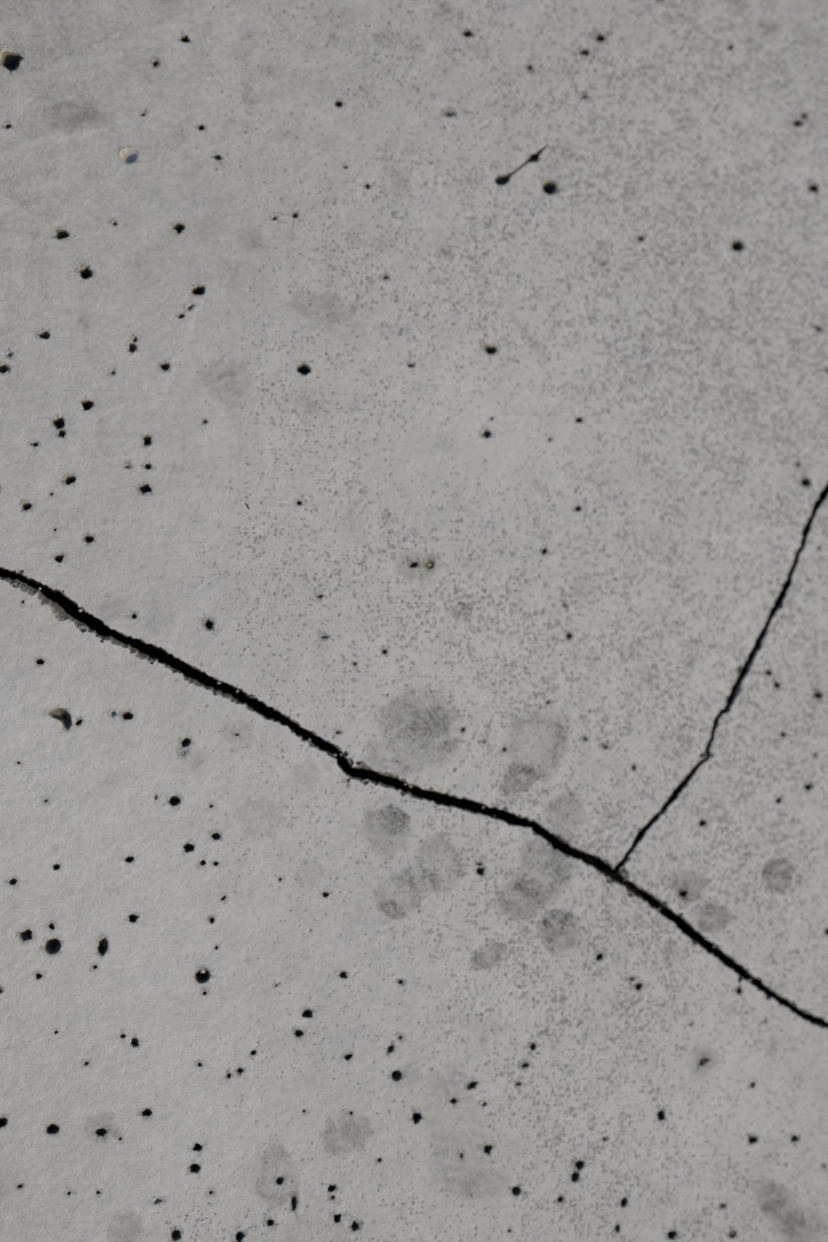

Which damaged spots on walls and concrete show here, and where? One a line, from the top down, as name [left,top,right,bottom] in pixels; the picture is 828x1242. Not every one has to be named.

crack [0,480,828,1029]